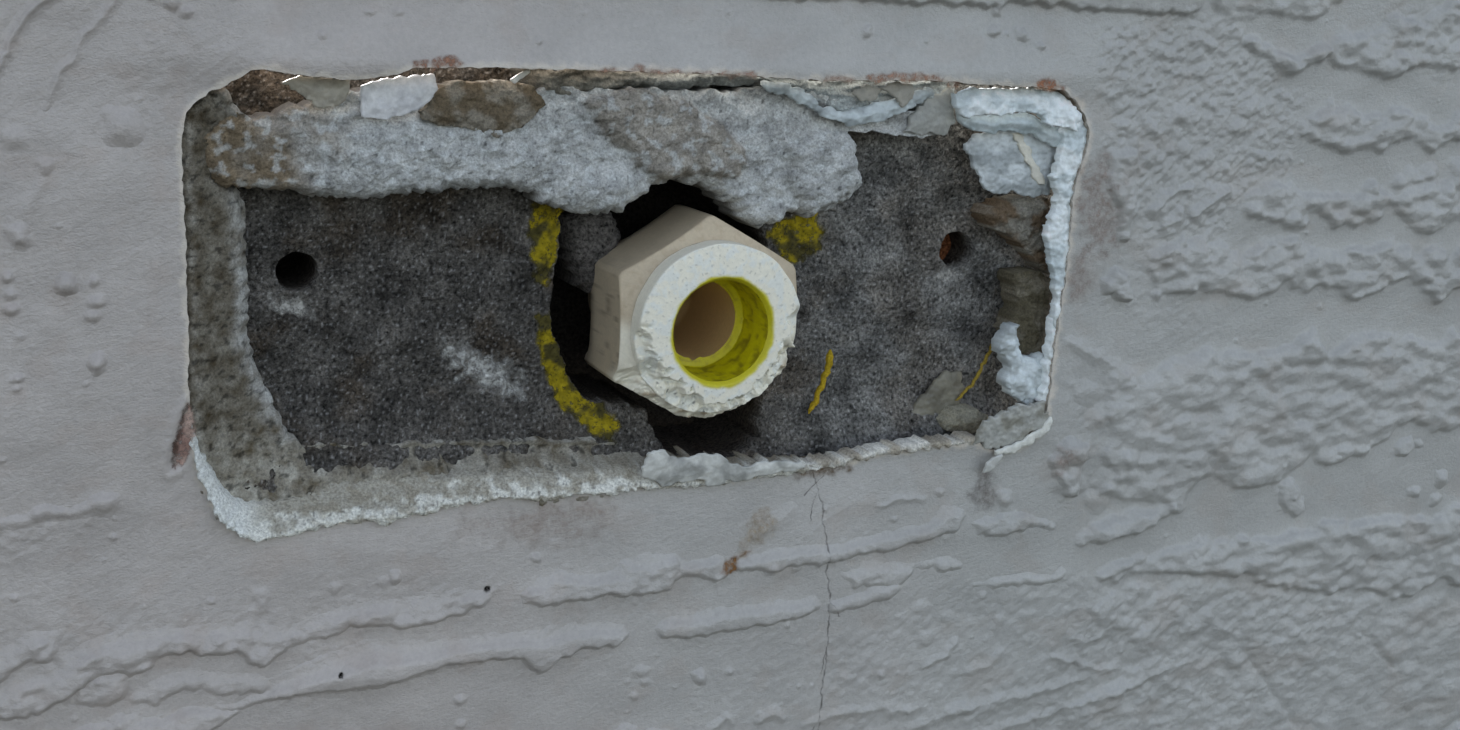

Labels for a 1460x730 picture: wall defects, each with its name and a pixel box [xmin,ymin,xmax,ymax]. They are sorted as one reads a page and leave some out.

spalling [172,69,1089,542]